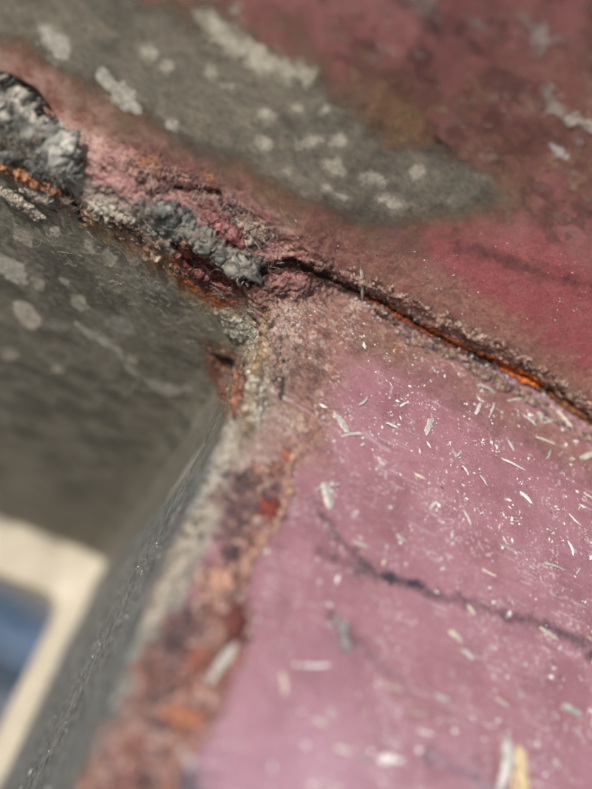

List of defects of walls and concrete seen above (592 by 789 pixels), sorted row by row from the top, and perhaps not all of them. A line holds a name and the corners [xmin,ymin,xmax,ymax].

corrosion [98,154,220,199]
peeling [0,0,515,237]
corrosion [54,186,231,313]
crack [198,338,258,420]
crack [243,253,592,443]